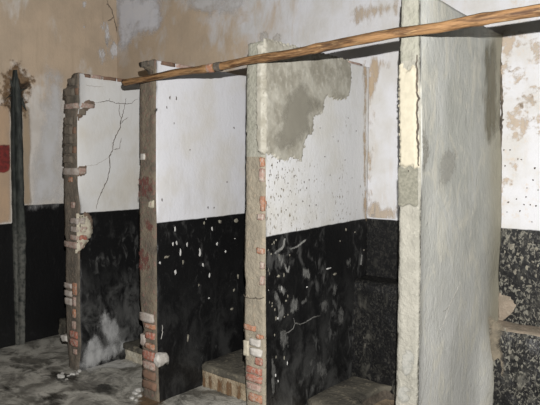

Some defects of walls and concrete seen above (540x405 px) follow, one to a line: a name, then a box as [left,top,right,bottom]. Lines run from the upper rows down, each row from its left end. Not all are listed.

peeling [99,0,162,61]
peeling [502,36,520,55]
flaking render [63,78,78,96]
flaking render [62,100,95,182]
crack [88,98,137,208]
peeling [502,96,536,140]
leakage [82,314,136,372]